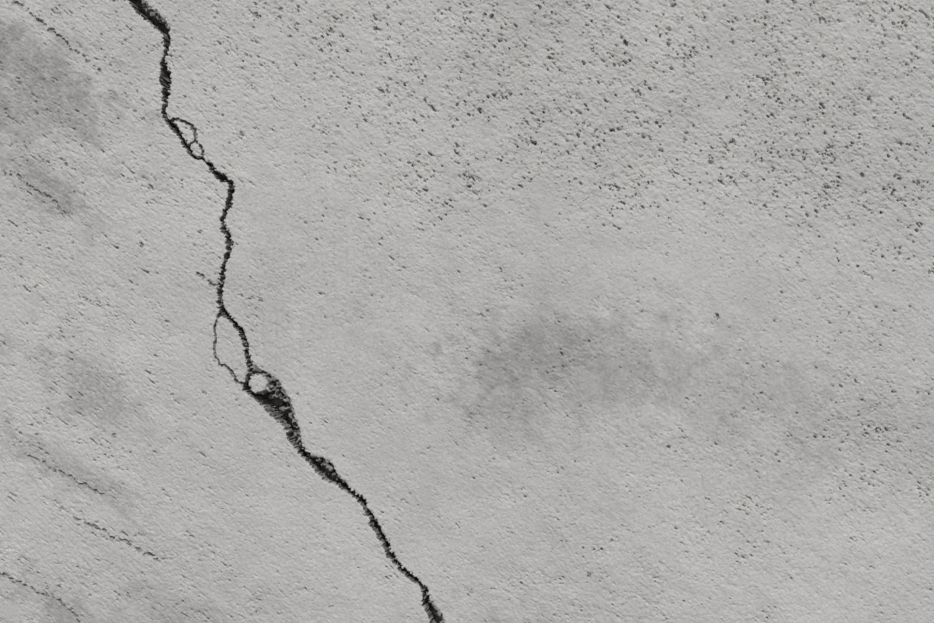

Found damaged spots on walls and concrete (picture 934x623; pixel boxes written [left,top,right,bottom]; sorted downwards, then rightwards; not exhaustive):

crack [112,0,314,463]
crack [340,480,437,623]